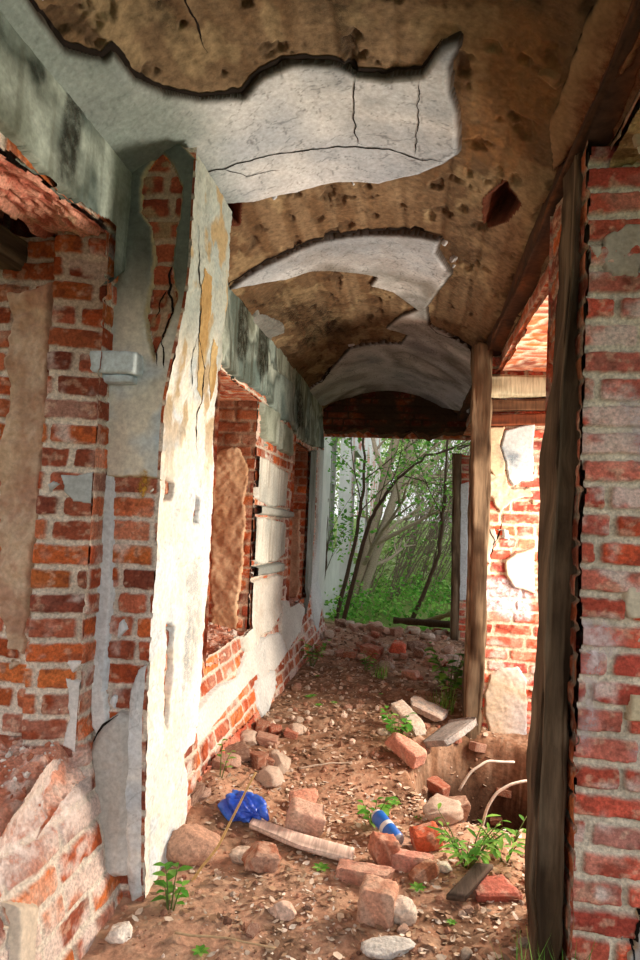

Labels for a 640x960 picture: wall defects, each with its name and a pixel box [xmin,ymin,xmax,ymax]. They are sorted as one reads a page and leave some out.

crack [29,0,458,177]
flaking render [538,0,632,170]
leakage [61,95,82,176]
spalling [482,179,522,228]
crack [228,226,441,285]
crack [156,261,174,366]
crack [191,226,206,453]
flaking render [0,0,472,901]
flaking render [491,425,535,486]
flaking render [487,528,510,564]
flaking render [504,548,538,594]
crack [629,908,640,960]